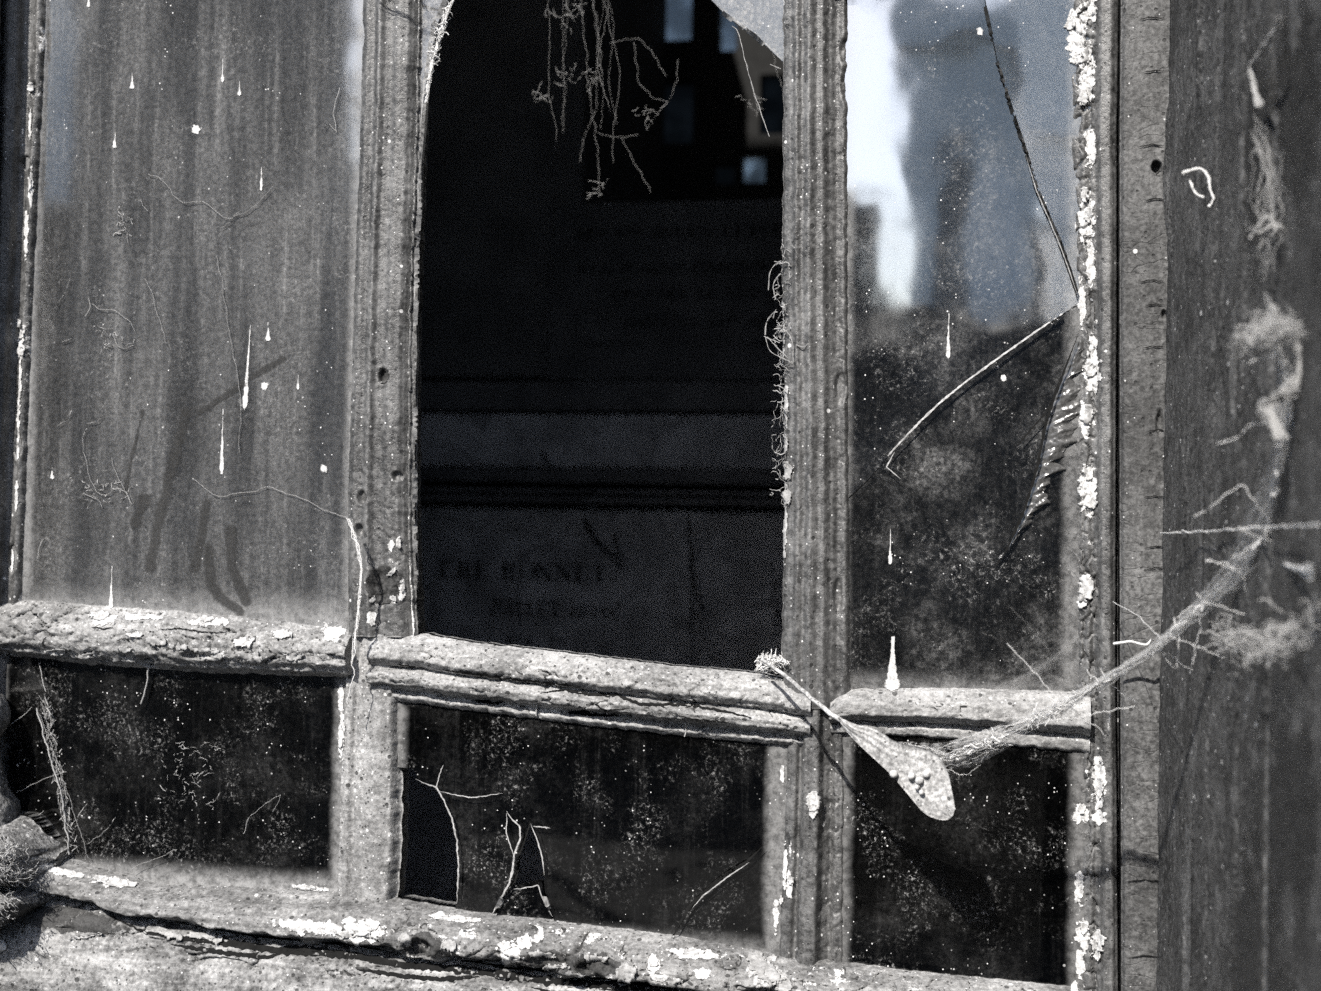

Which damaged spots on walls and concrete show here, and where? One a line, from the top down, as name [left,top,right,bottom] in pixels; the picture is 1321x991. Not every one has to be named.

peeling [1064,0,1098,109]
peeling [1083,129,1097,168]
peeling [998,186,1103,562]
peeling [1077,573,1094,608]
peeling [806,791,822,819]
peeling [773,841,794,936]
peeling [271,911,481,956]
spalling [495,927,721,984]
peeling [746,950,801,991]